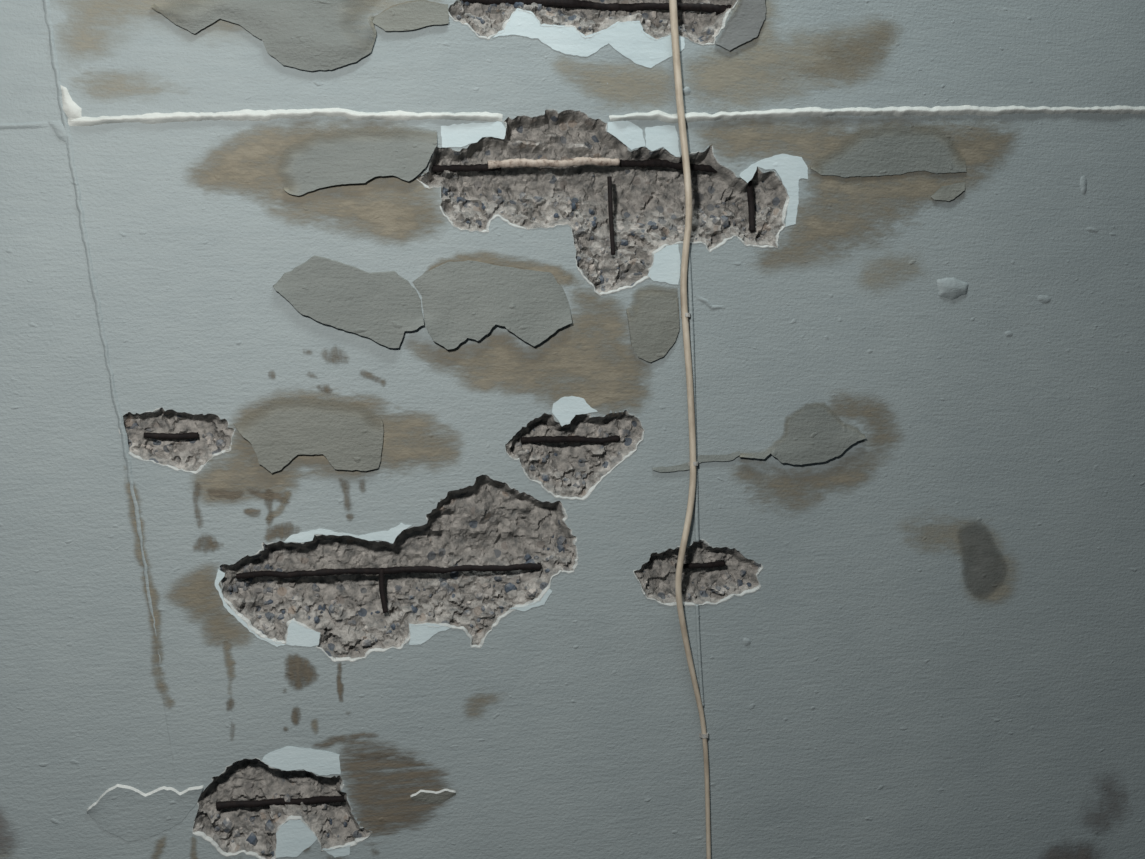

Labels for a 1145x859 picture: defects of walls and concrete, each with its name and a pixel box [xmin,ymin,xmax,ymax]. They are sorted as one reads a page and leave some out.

spalling [151,0,766,71]
spalling [273,109,967,362]
peeling [119,400,384,474]
spalling [215,396,644,662]
spalling [633,539,764,607]
water stain [961,525,1004,596]
spalling [87,746,372,859]